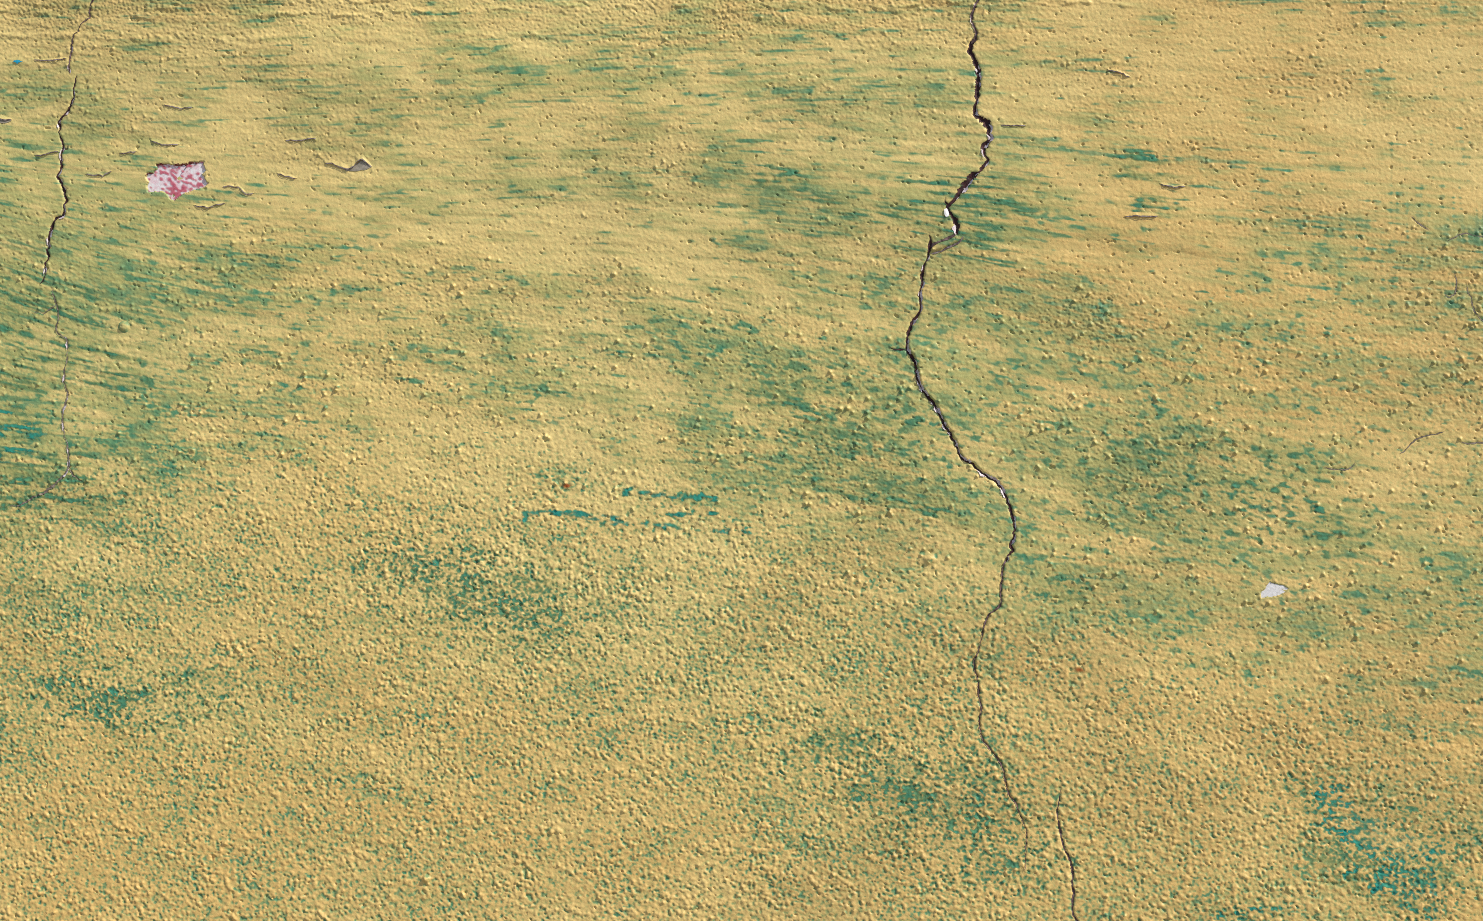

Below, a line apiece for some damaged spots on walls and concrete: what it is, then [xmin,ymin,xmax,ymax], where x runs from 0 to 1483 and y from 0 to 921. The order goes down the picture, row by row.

peeling [119,138,180,154]
peeling [146,161,254,208]
crack [11,0,94,507]
crack [891,0,1078,921]
peeling [1261,582,1288,598]